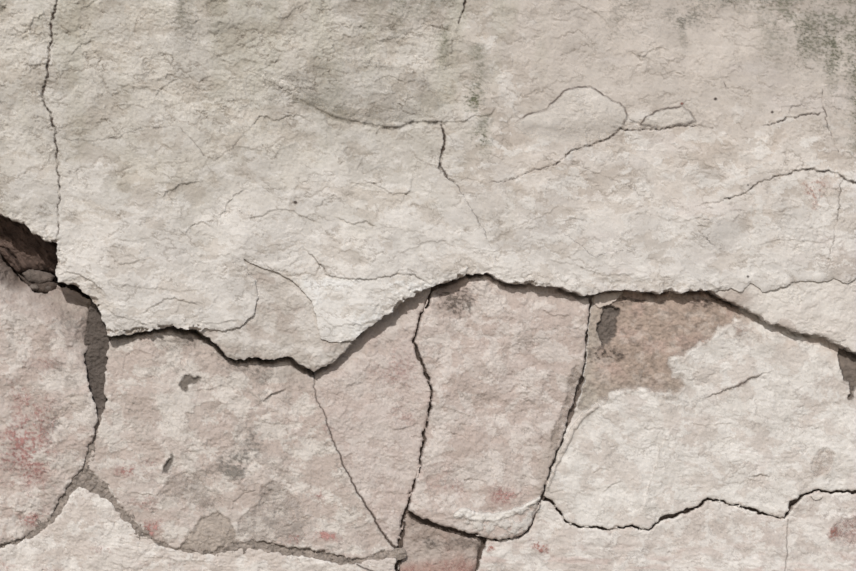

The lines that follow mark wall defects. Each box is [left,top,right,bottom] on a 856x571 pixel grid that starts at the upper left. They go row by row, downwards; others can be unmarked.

crack [42,0,61,235]
crack [439,125,453,182]
spalling [0,215,58,293]
spalling [199,259,352,372]
spalling [179,375,200,391]
crack [313,284,529,571]
crack [540,295,856,530]
peeling [547,276,856,488]
peeling [162,455,308,551]
peeling [454,496,540,535]